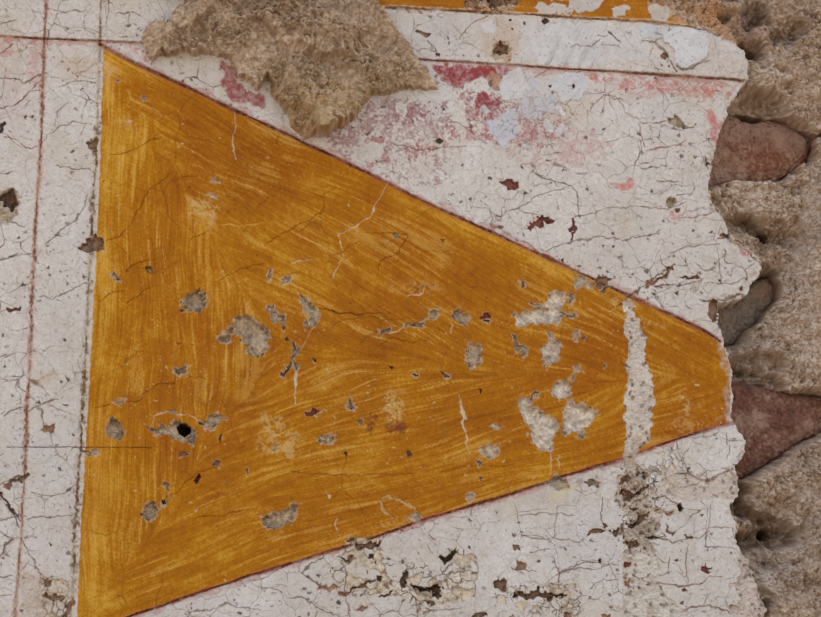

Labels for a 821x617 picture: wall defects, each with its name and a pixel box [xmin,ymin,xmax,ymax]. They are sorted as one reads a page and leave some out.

crack [515,95,714,219]
spalling [0,188,21,224]
crack [609,244,755,312]
spalling [512,274,668,370]
crack [440,394,515,473]
spalling [517,365,599,452]
crack [0,475,76,597]
spalling [317,535,479,615]
spalling [468,576,582,617]
crack [512,505,619,590]
spalling [584,446,738,569]
crack [643,506,736,614]